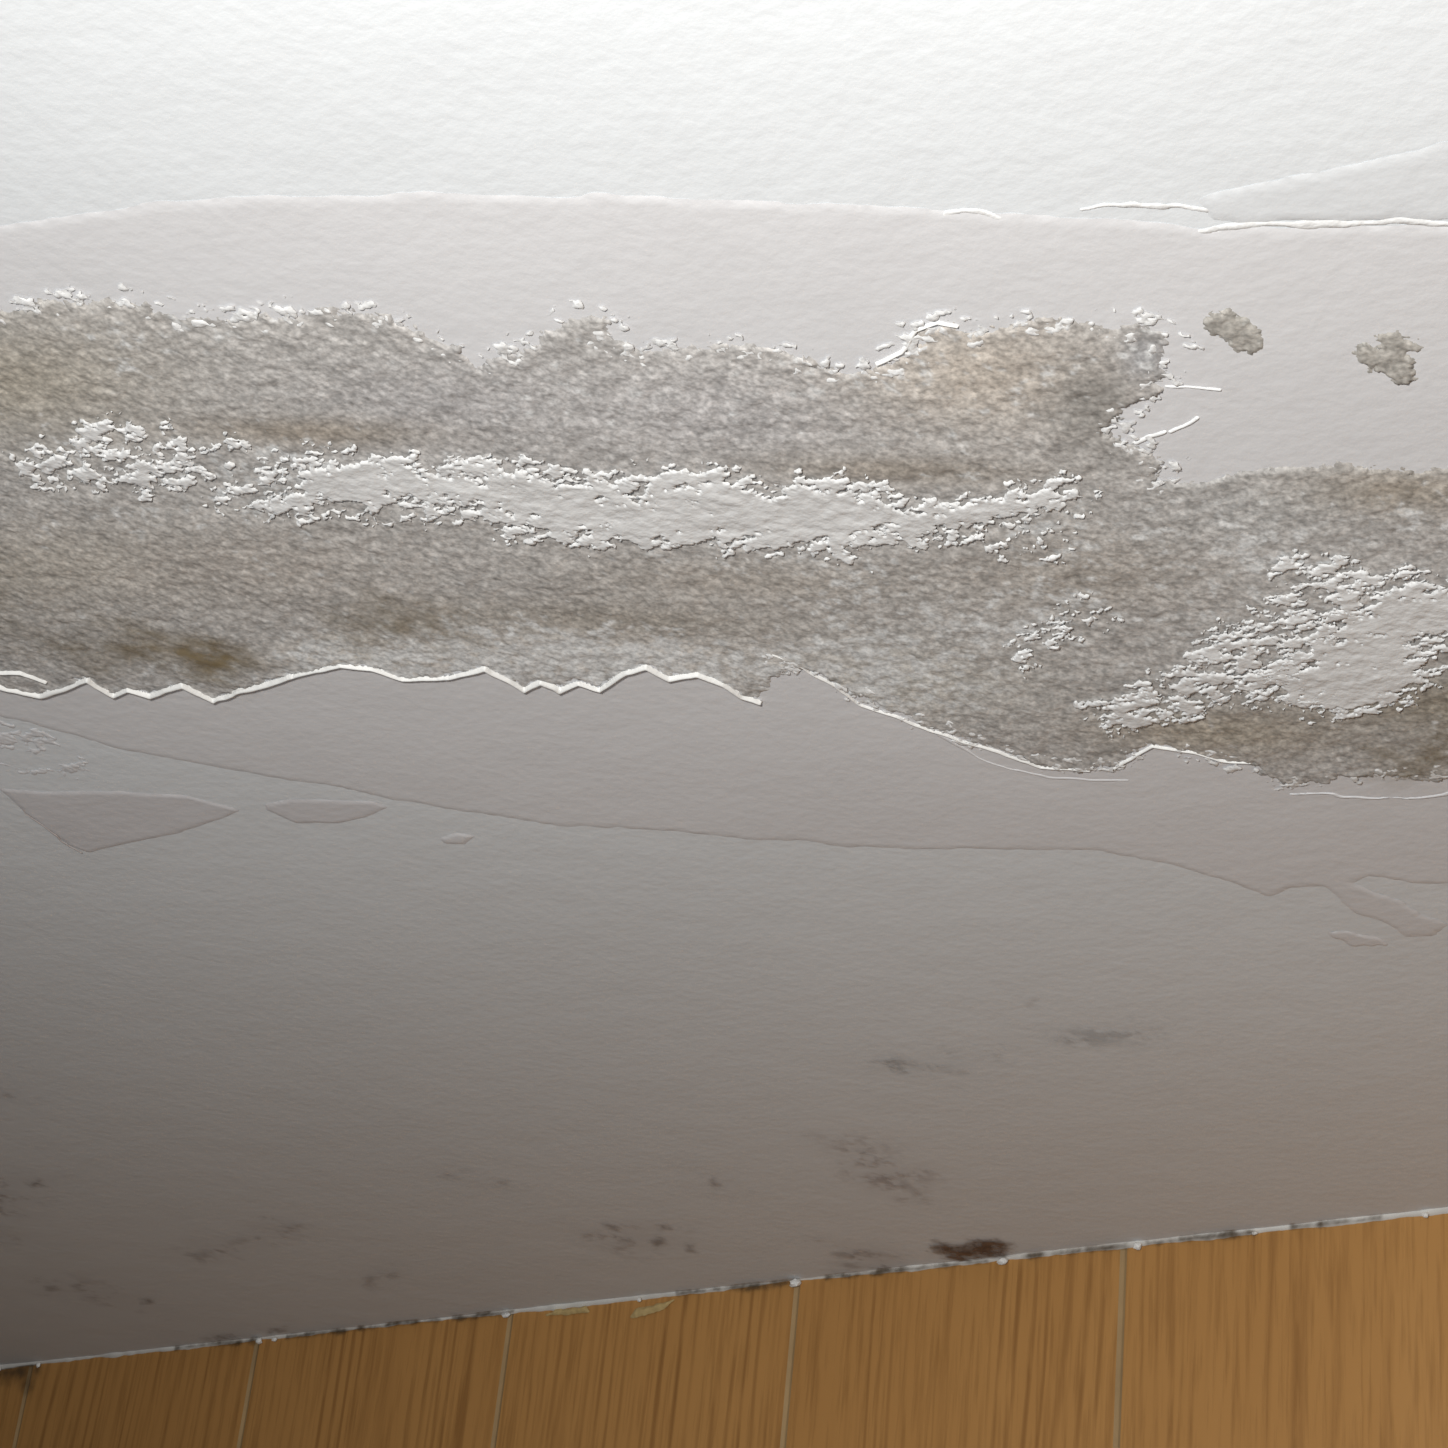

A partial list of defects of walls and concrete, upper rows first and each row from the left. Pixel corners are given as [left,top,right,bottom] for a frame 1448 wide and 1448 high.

spalling [0,142,1448,947]